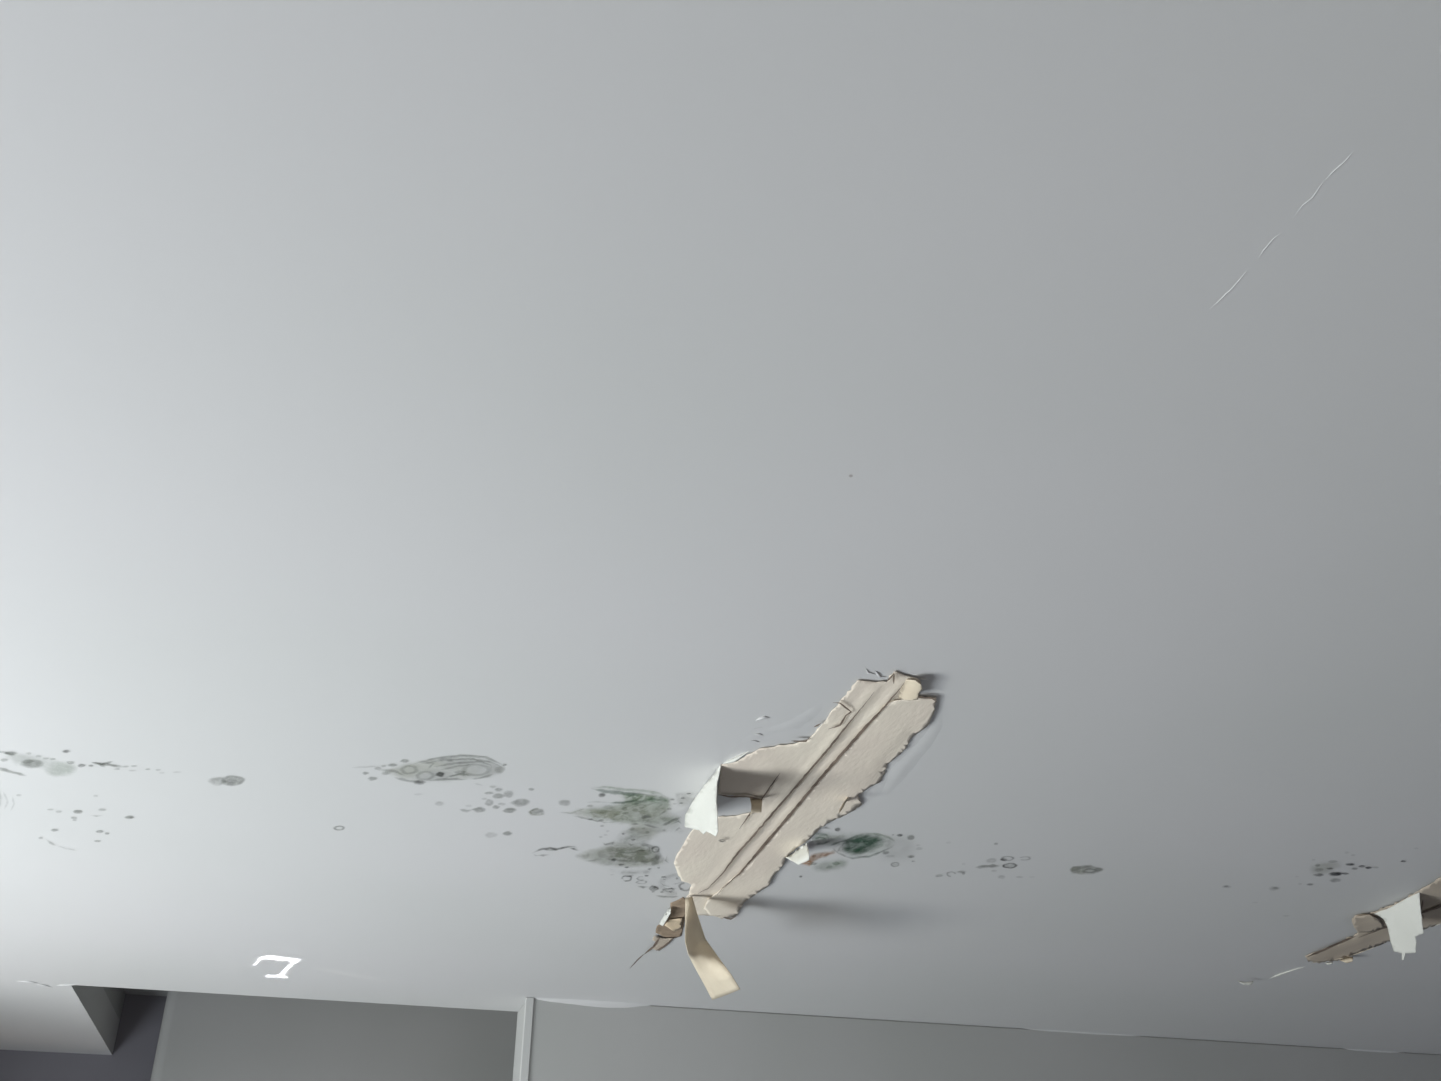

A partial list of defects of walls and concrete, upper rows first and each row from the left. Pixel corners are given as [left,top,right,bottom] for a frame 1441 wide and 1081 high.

spalling [656,897,685,938]